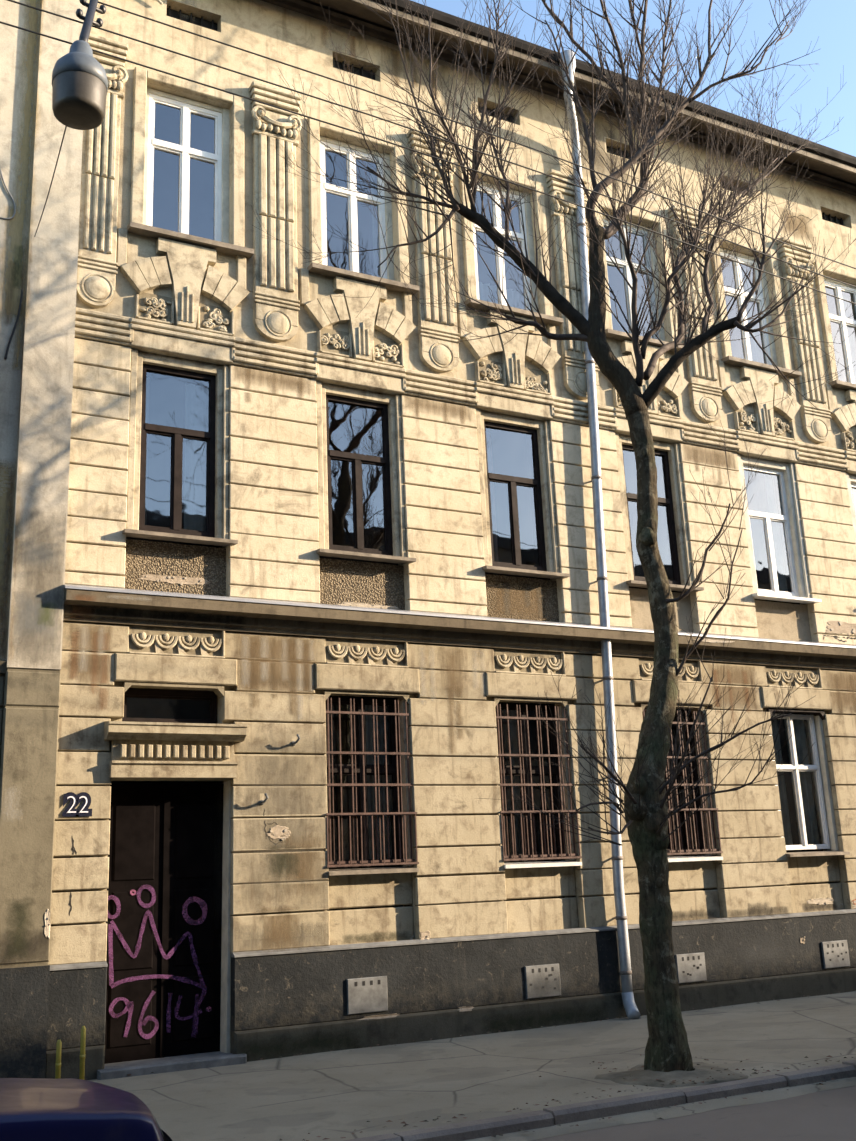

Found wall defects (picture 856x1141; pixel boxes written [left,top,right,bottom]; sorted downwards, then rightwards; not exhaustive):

damp [4,0,43,367]
damp [0,465,14,648]
damp [21,526,52,650]